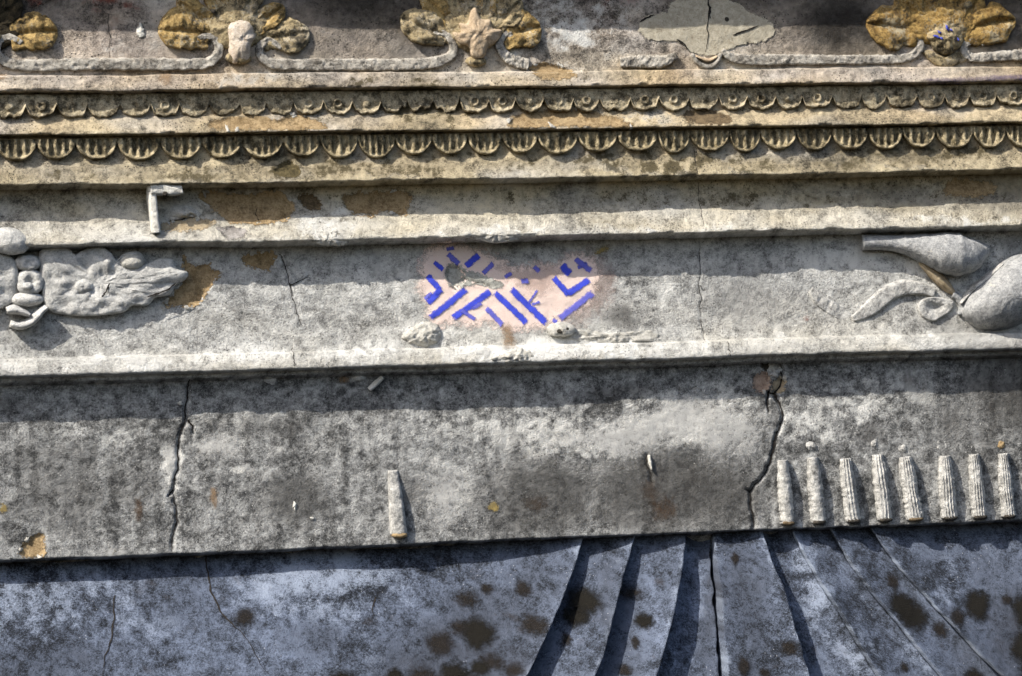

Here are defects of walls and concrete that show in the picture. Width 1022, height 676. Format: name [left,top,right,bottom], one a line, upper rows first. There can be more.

flaking render [273,160,301,178]
flaking render [160,189,323,240]
flaking render [341,189,413,219]
flaking render [160,254,221,310]
flaking render [241,249,278,273]
crack [279,254,307,366]
crack [168,379,193,546]
crack [746,371,784,528]
flaking render [17,533,48,561]
crack [102,595,115,676]
crack [205,555,267,672]